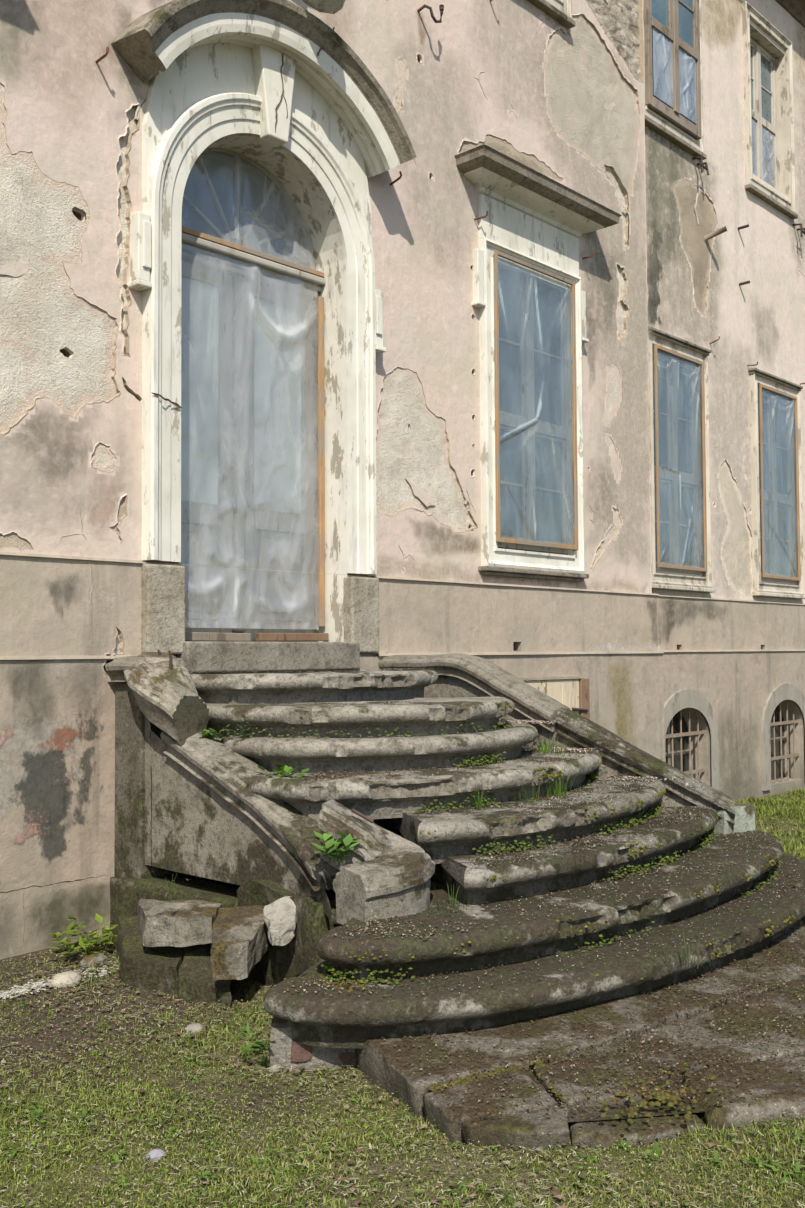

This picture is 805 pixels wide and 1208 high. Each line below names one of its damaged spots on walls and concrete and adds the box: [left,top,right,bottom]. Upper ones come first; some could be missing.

crack [275,53,288,132]
flaking render [0,82,121,436]
flaking render [458,13,718,556]
water stain [645,133,681,325]
flaking render [376,366,478,533]
water stain [0,714,103,861]